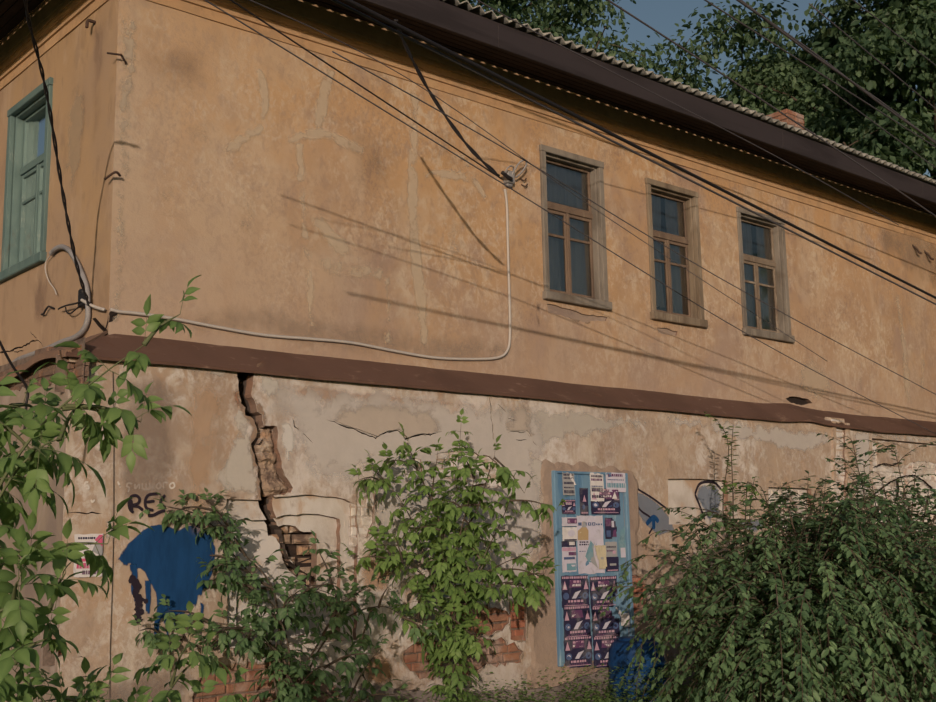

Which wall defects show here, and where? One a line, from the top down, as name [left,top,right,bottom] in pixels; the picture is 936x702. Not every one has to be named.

peeling [218,392,266,500]
crack [238,372,316,586]
crack [332,421,438,440]
peeling [253,373,542,583]
peeling [675,417,845,509]
flaking render [786,397,808,405]
peeling [855,433,877,498]
flaking render [401,600,529,680]